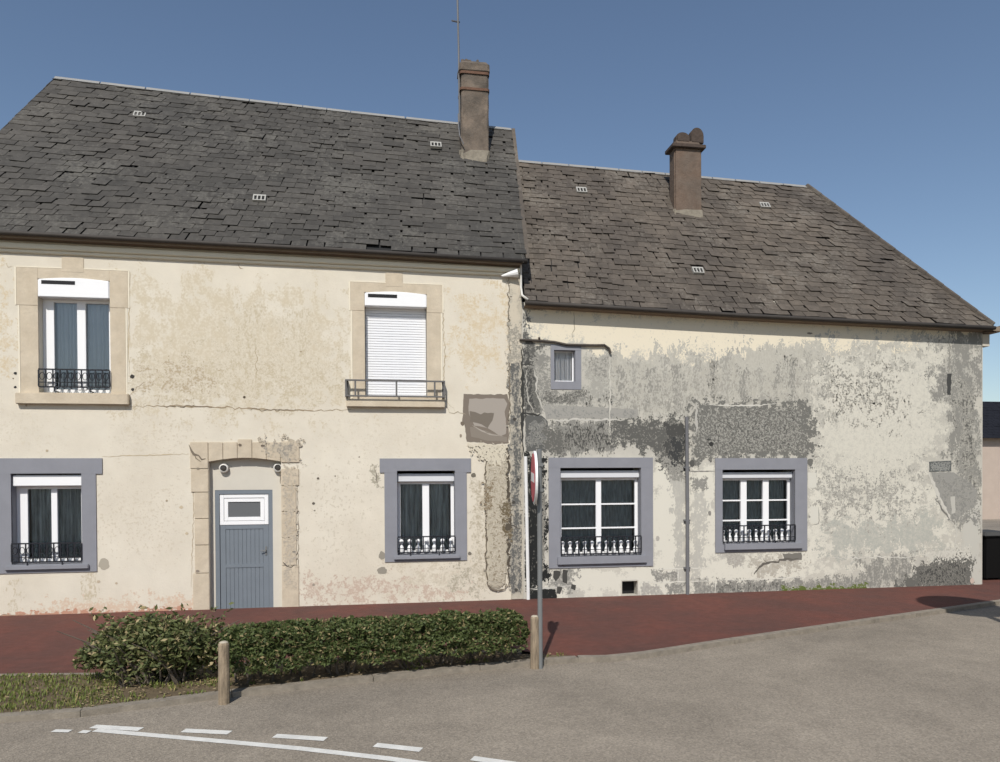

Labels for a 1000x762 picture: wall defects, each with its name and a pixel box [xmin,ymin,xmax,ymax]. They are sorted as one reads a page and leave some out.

flaking render [808,472,817,488]
peeling [922,544,972,563]
peeling [553,570,576,594]